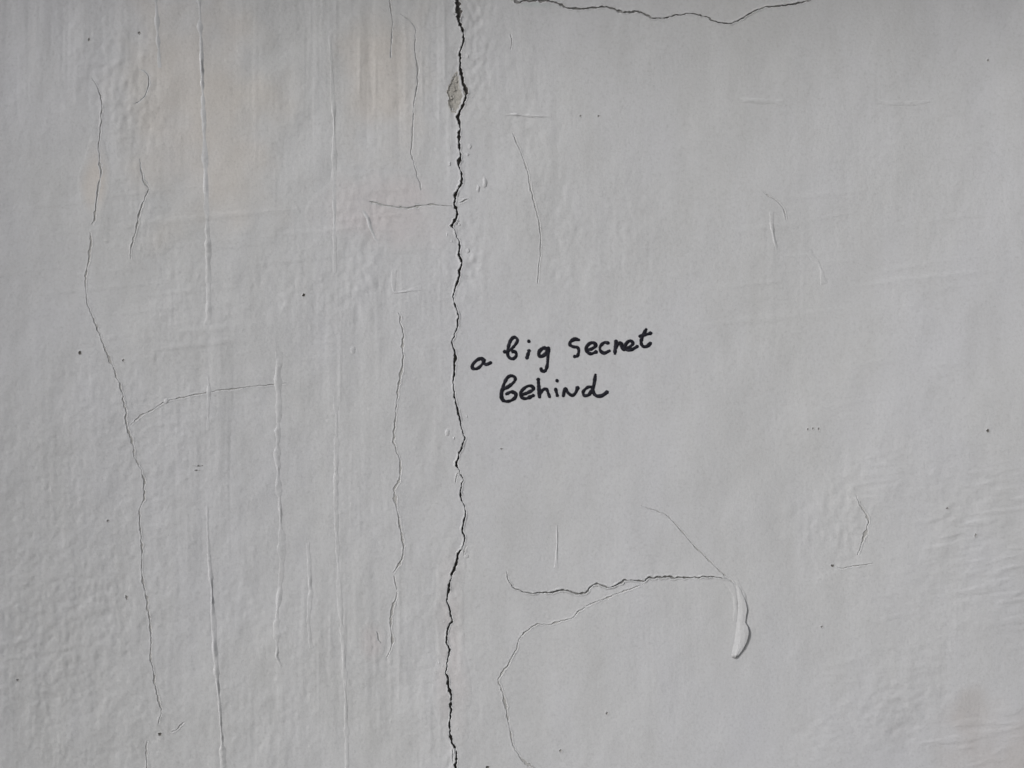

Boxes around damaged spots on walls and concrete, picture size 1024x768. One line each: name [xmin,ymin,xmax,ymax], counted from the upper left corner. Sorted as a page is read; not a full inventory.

flaking render [446,72,465,113]
crack [509,0,816,26]
crack [83,77,287,768]
crack [369,0,473,768]
crack [496,504,736,768]